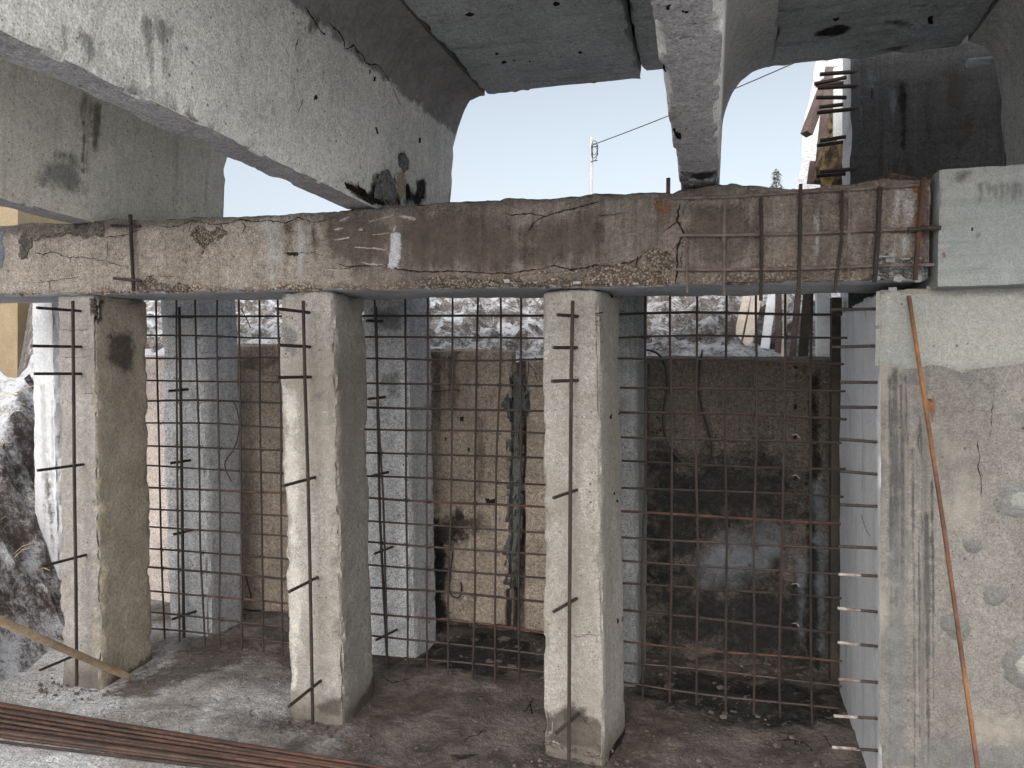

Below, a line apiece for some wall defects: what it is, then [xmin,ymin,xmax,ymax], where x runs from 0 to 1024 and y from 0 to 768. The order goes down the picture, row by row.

crack [31,217,330,288]
spalling [331,152,427,252]
crack [504,200,621,231]
crack [666,200,690,284]
spalling [18,214,322,725]
spalling [362,168,941,767]
damp [614,374,843,763]
damp [889,369,935,751]